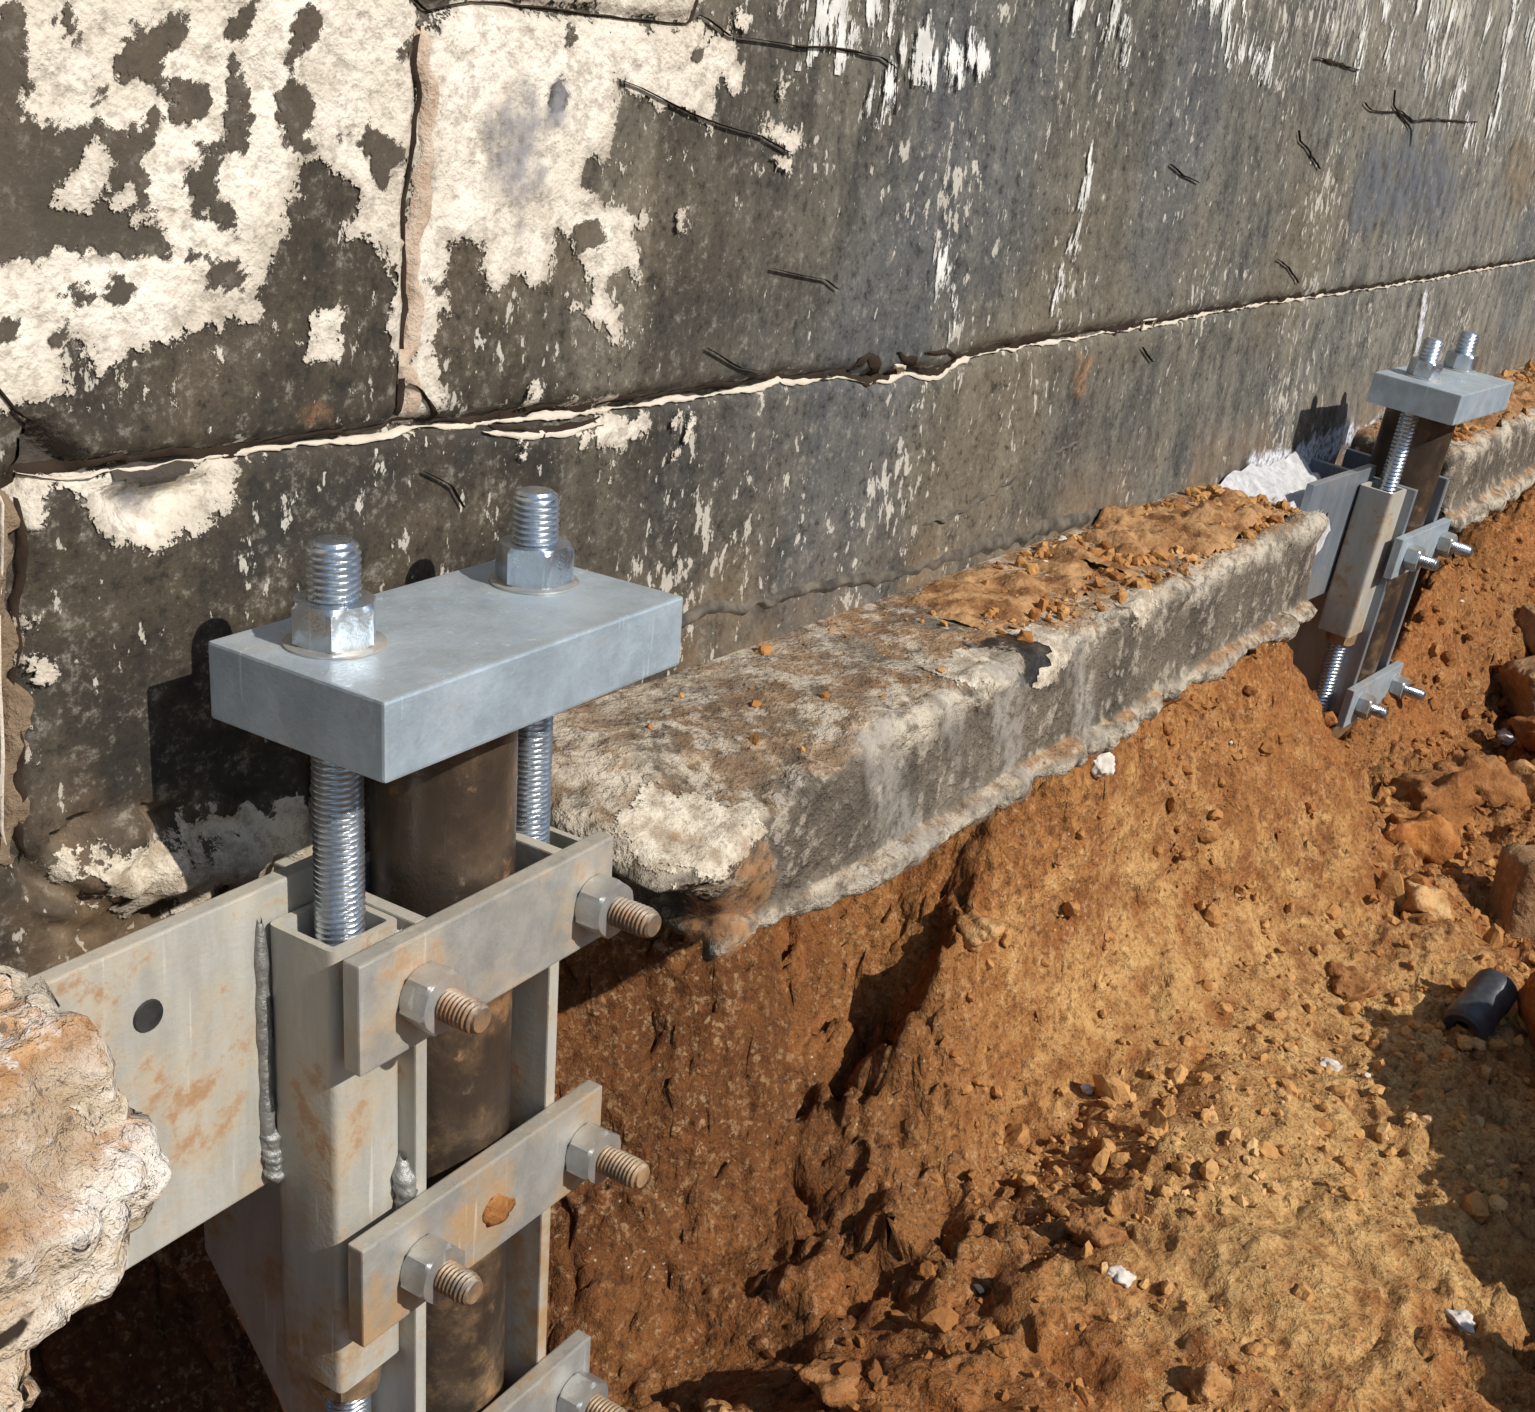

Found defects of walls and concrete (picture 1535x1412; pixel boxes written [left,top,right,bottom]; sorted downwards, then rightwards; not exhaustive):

peeling [1326,0,1535,157]
peeling [0,0,991,595]
crack [0,0,1535,685]
peeling [1048,143,1094,334]
crack [13,731,28,859]
peeling [0,611,62,868]